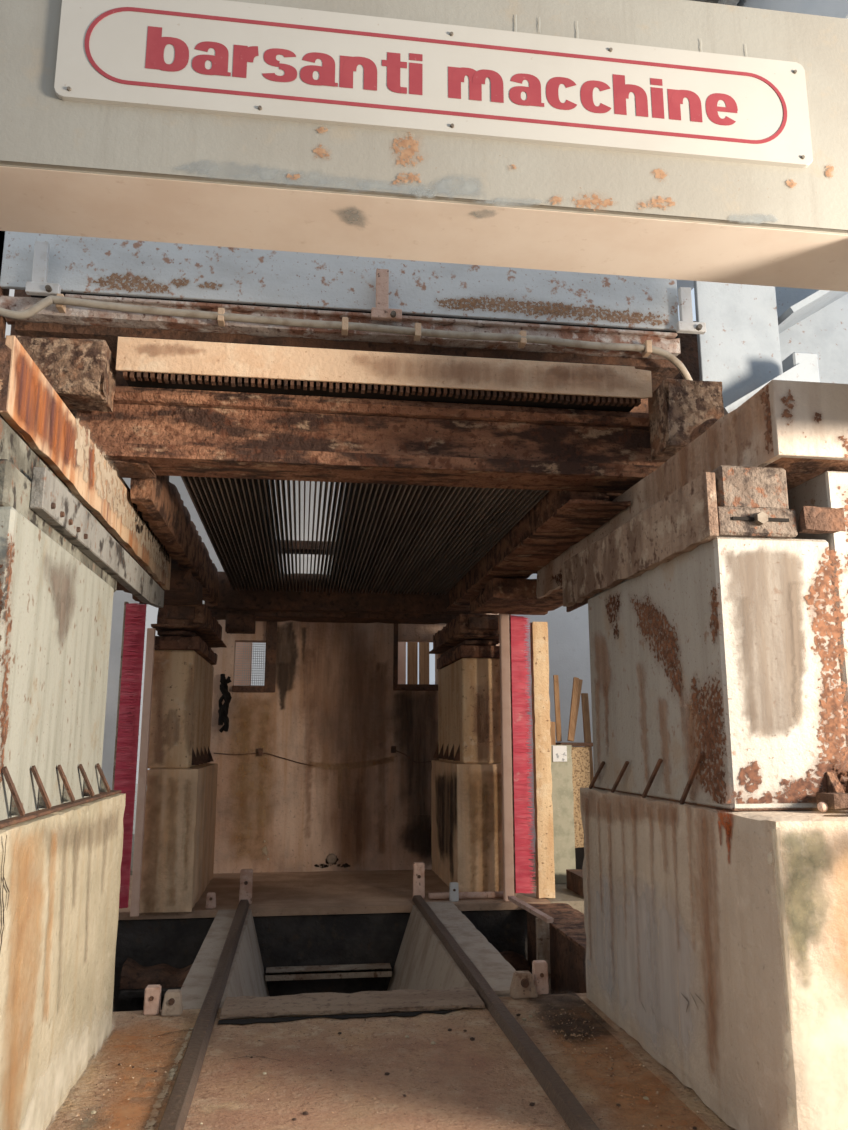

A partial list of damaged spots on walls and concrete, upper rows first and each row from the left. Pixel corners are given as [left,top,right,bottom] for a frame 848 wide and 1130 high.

rust [390,132,423,184]
rust [550,194,613,211]
rust [638,196,675,210]
rust [596,486,848,863]
water stain [790,583,802,722]
water stain [784,832,829,974]